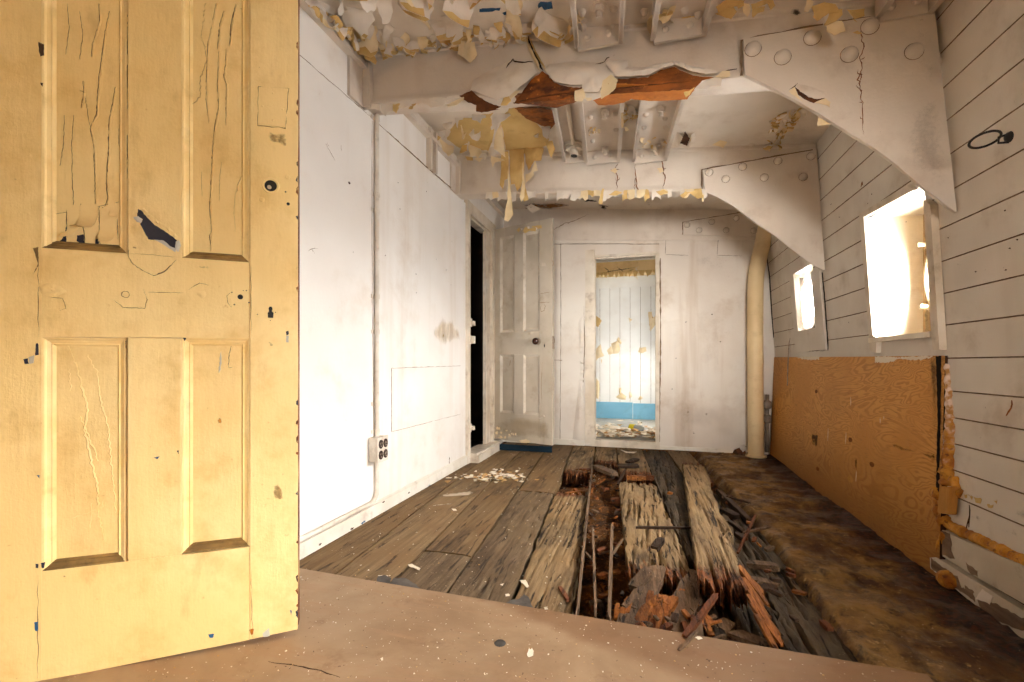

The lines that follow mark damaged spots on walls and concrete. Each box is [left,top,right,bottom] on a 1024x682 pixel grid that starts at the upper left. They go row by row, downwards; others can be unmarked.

peeling [365,57,736,233]
peeling [647,5,695,33]
peeling [747,83,831,151]
crack [853,19,865,132]
peeling [286,0,585,624]
peeling [931,531,1024,631]